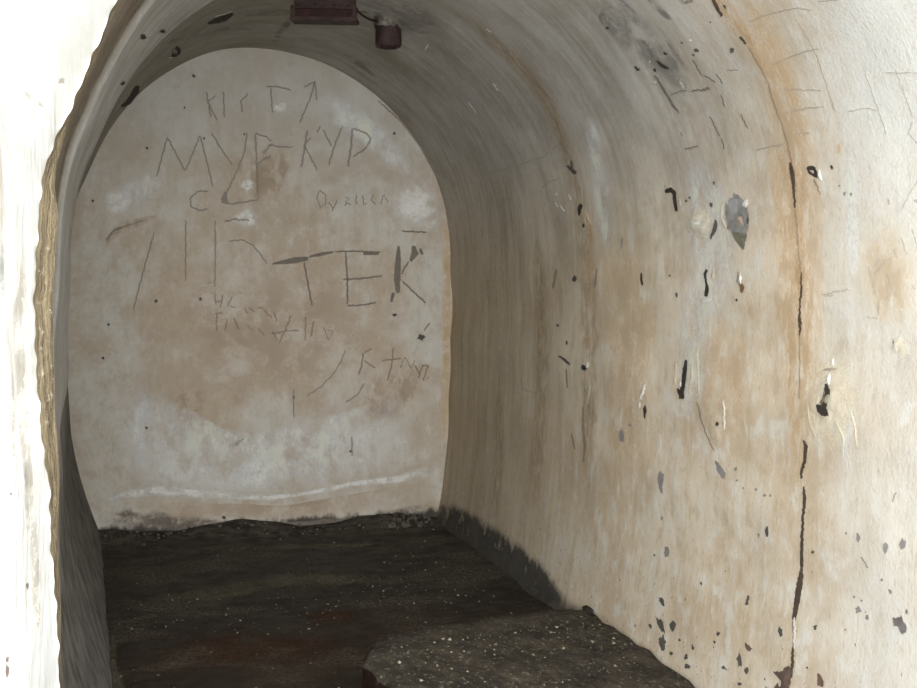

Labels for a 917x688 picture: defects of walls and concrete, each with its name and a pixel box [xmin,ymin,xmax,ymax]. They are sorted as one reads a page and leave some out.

crack [712,0,723,17]
damp [241,155,289,194]
spalling [665,186,678,211]
flaking render [721,193,749,250]
crack [739,37,803,399]
damp [188,280,355,376]
spalling [673,349,699,399]
spalling [816,358,836,416]
damp [118,391,418,529]
crack [790,440,808,678]
peeling [893,610,908,635]
flaking render [773,666,792,688]